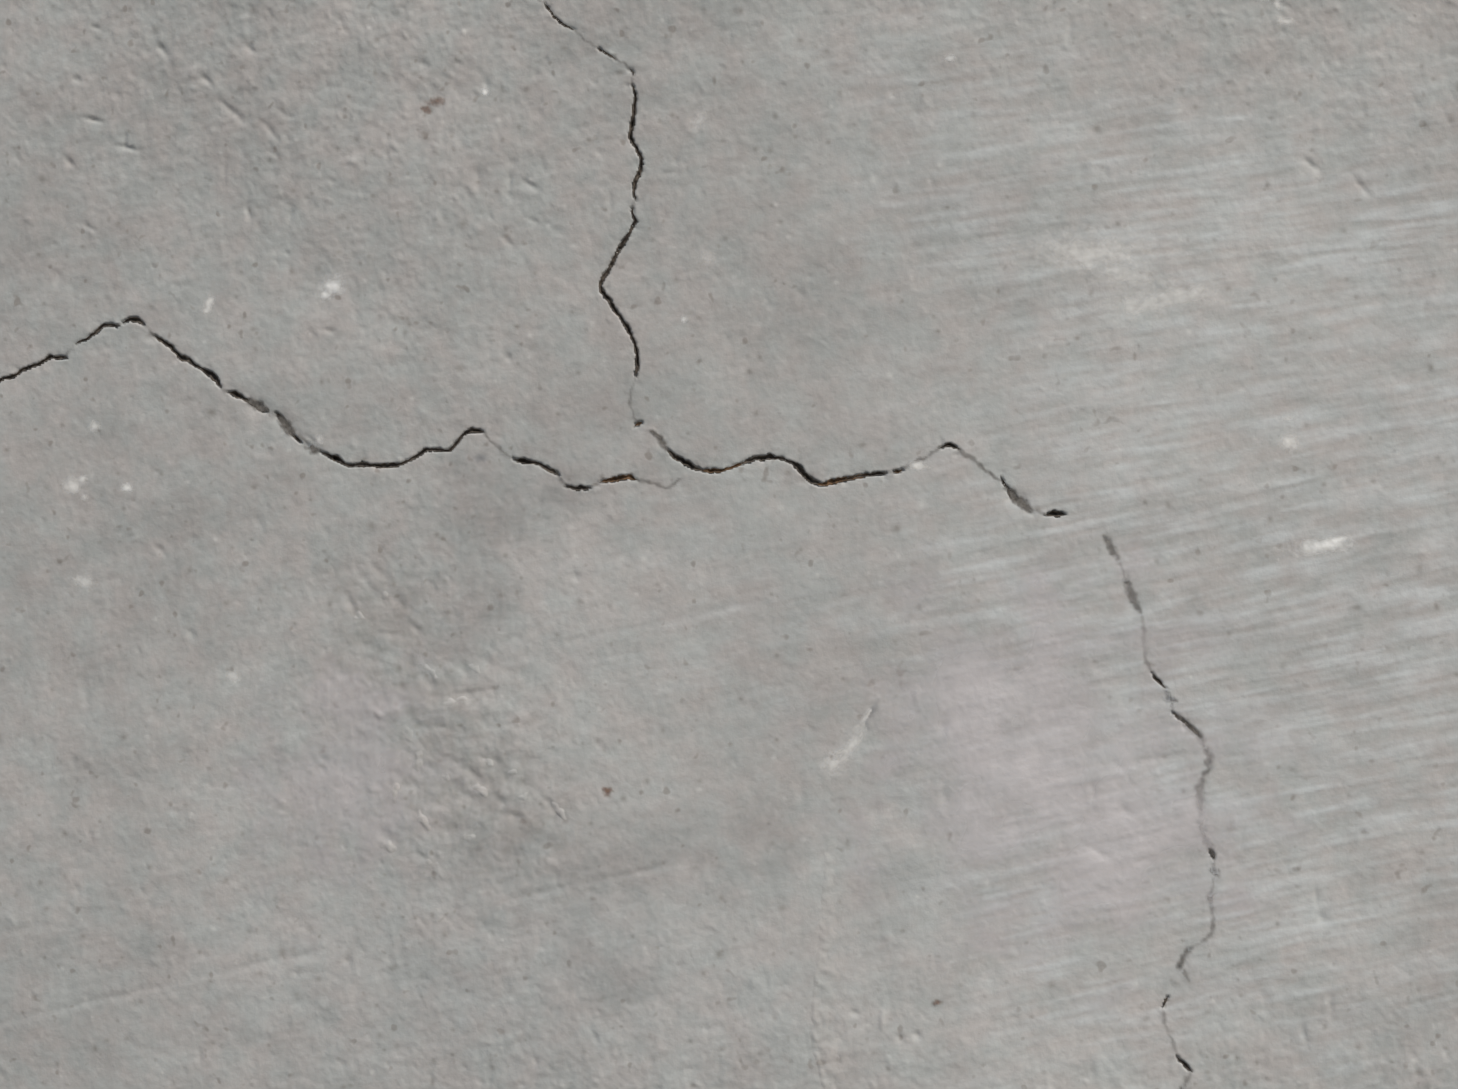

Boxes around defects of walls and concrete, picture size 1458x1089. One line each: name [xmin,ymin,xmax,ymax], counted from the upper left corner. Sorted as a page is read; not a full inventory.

crack [544,3,643,374]
crack [0,317,484,468]
crack [515,458,637,491]
crack [635,422,902,486]
crack [940,443,1066,517]
crack [1105,537,1140,610]
crack [1152,673,1215,858]
crack [1163,949,1188,1007]
crack [1177,1057,1192,1072]